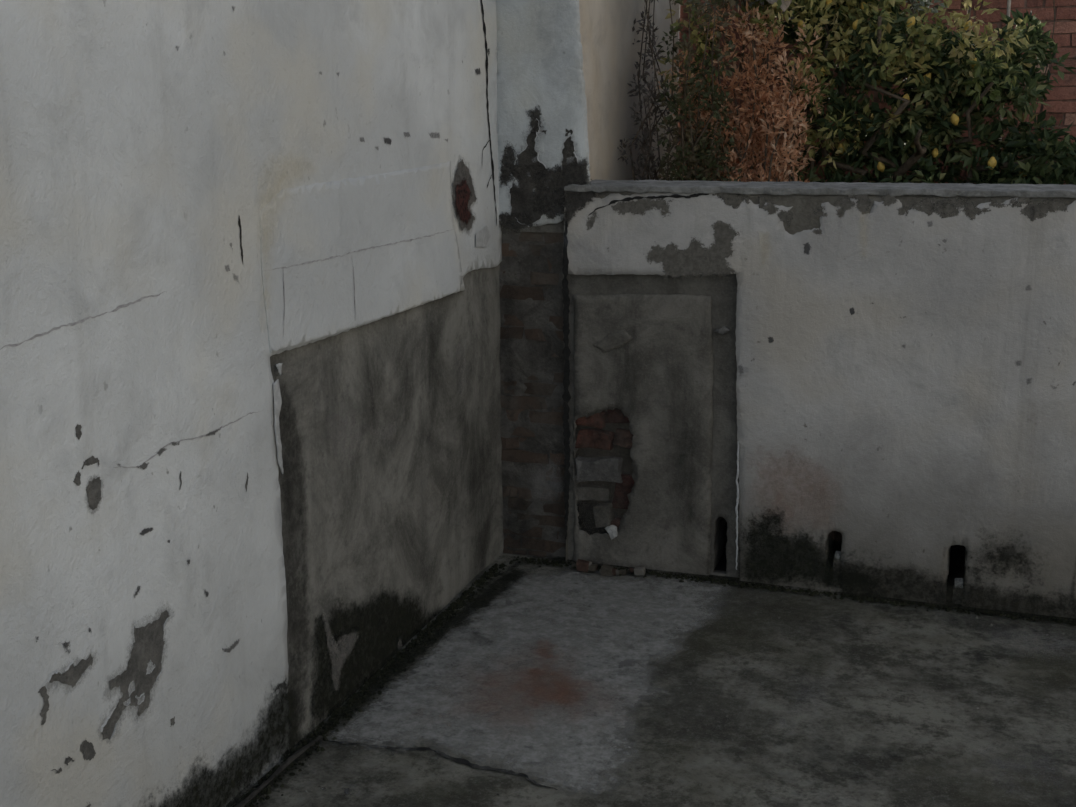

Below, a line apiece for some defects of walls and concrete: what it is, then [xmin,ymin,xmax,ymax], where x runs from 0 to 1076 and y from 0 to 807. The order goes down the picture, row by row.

crack [475,0,497,224]
flaking render [452,105,599,247]
peeling [647,220,740,278]
peeling [804,194,1068,255]
crack [0,292,163,350]
crack [114,409,264,469]
spalling [572,408,634,535]
leakage [279,387,308,723]
leakage [837,562,1076,628]
peeling [38,641,94,725]
peeling [51,610,170,774]
crack [323,740,557,790]